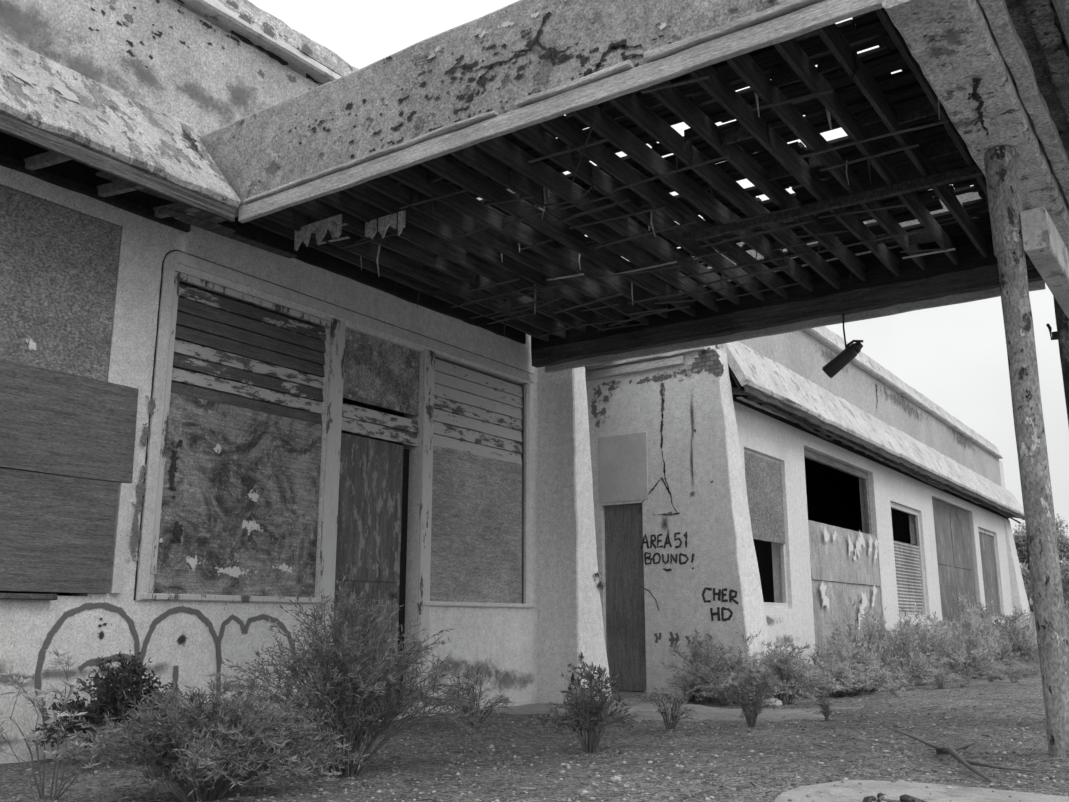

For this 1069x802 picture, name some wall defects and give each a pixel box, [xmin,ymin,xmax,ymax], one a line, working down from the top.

spalling [91,5,136,27]
spalling [126,24,173,68]
spalling [200,15,240,49]
peeling [226,0,277,40]
crack [468,12,646,104]
spalling [617,20,674,67]
peeling [52,83,81,104]
spalling [345,11,604,158]
crack [968,78,989,135]
spalling [182,126,204,161]
spalling [591,347,724,427]
crack [639,383,679,516]